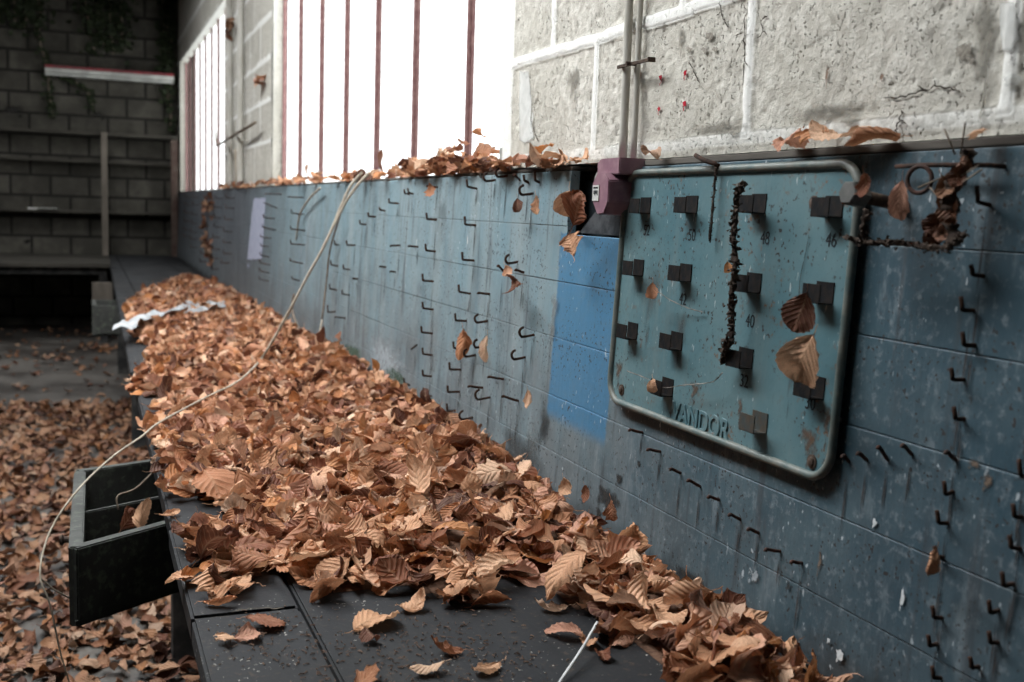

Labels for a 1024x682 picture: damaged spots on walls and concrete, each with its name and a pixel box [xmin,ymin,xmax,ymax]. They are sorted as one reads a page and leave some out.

crack [883,81,961,143]